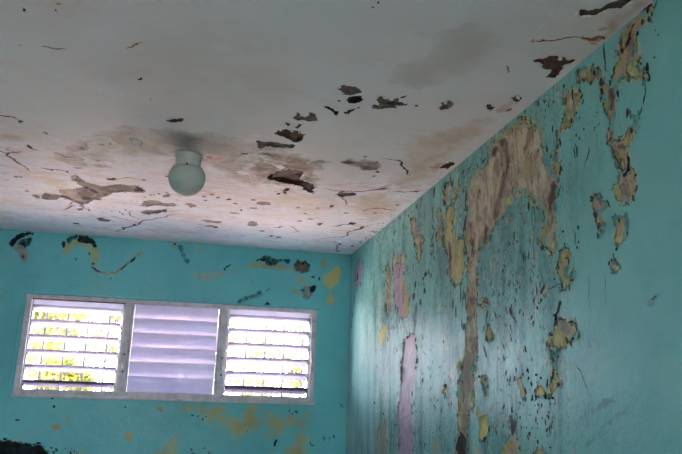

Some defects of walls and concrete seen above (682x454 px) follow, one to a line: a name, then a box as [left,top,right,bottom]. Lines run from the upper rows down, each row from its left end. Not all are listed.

corrosion [530,27,609,45]
crack [0,145,73,173]
spalling [25,175,181,216]
damp [53,125,346,215]
spalling [339,156,382,177]
crack [325,159,419,204]
damp [341,116,499,222]
peeling [336,203,425,263]
peeling [371,0,659,454]
peeling [243,255,310,274]
peeling [292,258,342,306]